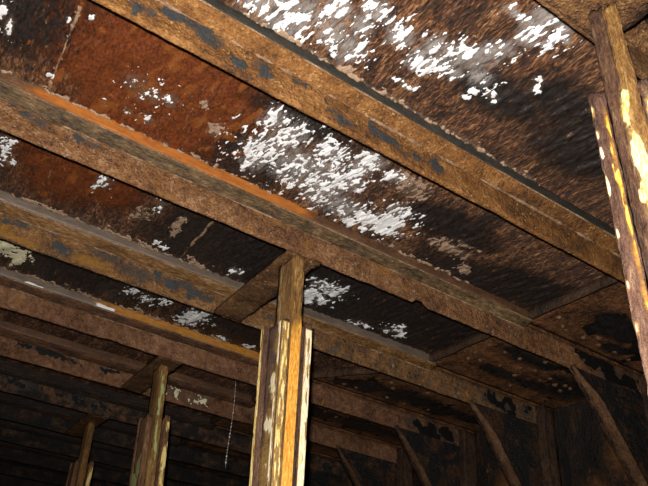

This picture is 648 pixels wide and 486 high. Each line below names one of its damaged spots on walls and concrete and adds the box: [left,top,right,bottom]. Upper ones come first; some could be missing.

corrosion [8,137,145,211]
corrosion [32,0,310,217]
water stain [210,130,278,192]
water stain [253,96,342,144]
water stain [450,59,604,182]
peeling [621,89,648,205]
peeling [0,240,35,273]
water stain [2,244,261,354]
water stain [151,207,285,284]
water stain [302,263,481,354]
water stain [394,171,570,308]
peeling [242,320,290,486]